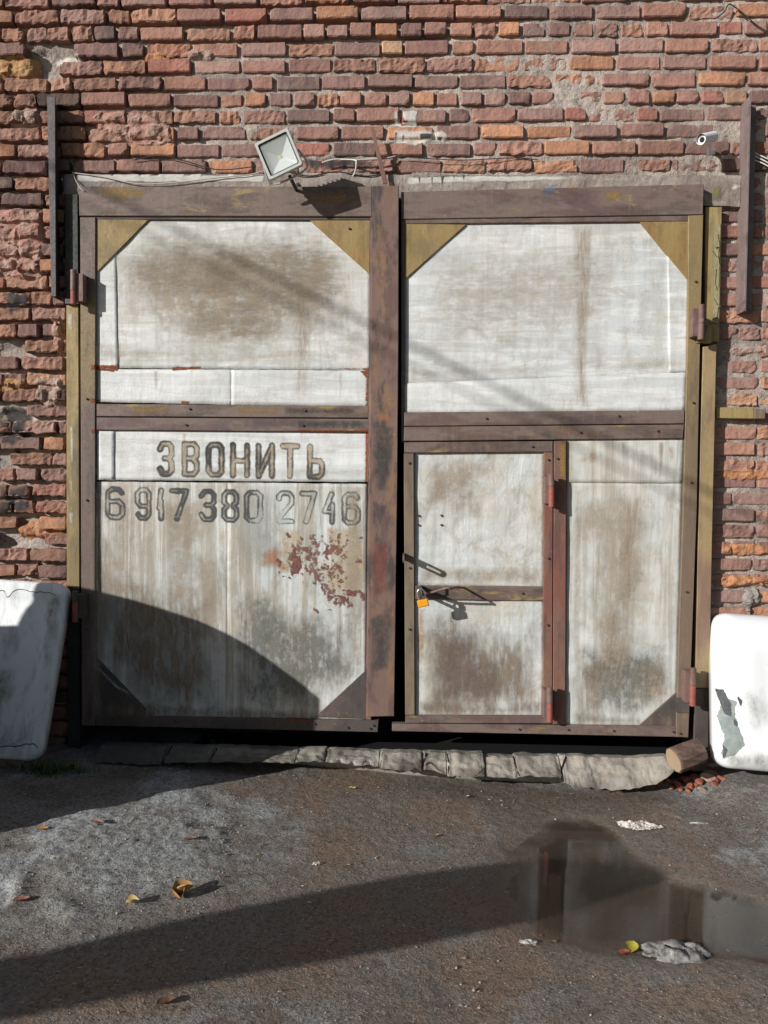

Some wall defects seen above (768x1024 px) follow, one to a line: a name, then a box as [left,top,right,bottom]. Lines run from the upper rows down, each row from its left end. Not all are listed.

spalling [17,514,71,539]